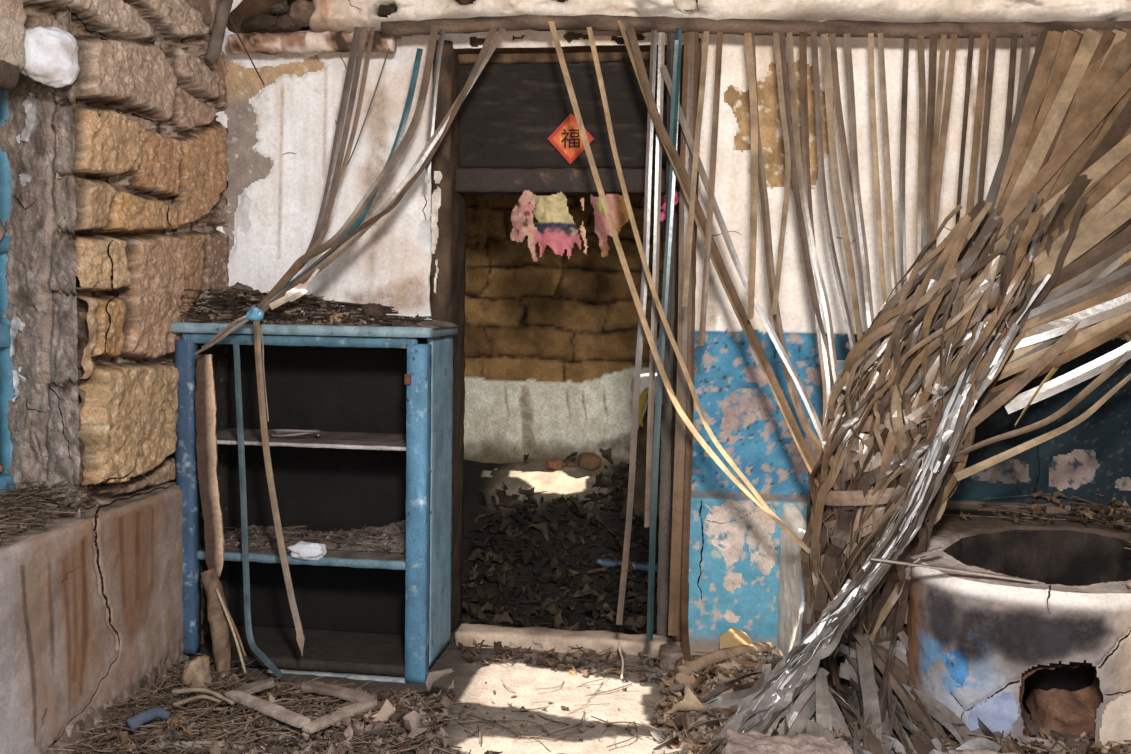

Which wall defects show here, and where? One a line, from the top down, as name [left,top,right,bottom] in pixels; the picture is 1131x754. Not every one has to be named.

peeling [223,55,324,253]
spalling [723,59,834,191]
crack [104,240,119,360]
peeling [718,366,776,435]
peeling [1049,449,1100,491]
peeling [1115,477,1131,491]
crack [26,384,175,752]
peeling [703,501,778,593]
peeling [720,610,741,623]
crack [950,680,1020,720]
peeling [1100,694,1131,751]